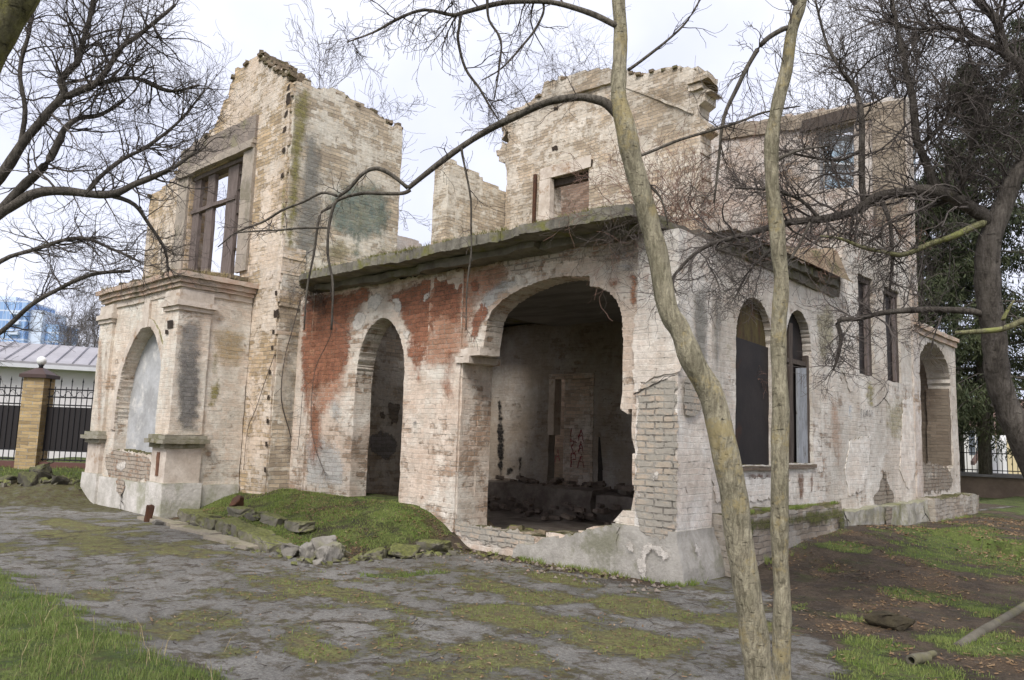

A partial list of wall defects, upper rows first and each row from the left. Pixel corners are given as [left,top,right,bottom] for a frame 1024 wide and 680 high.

water stain [281,137,391,254]
peeling [301,238,636,403]
water stain [177,322,200,430]
spalling [105,448,151,496]
flaking render [627,377,702,578]
spalling [873,470,894,525]
spalling [923,461,953,494]